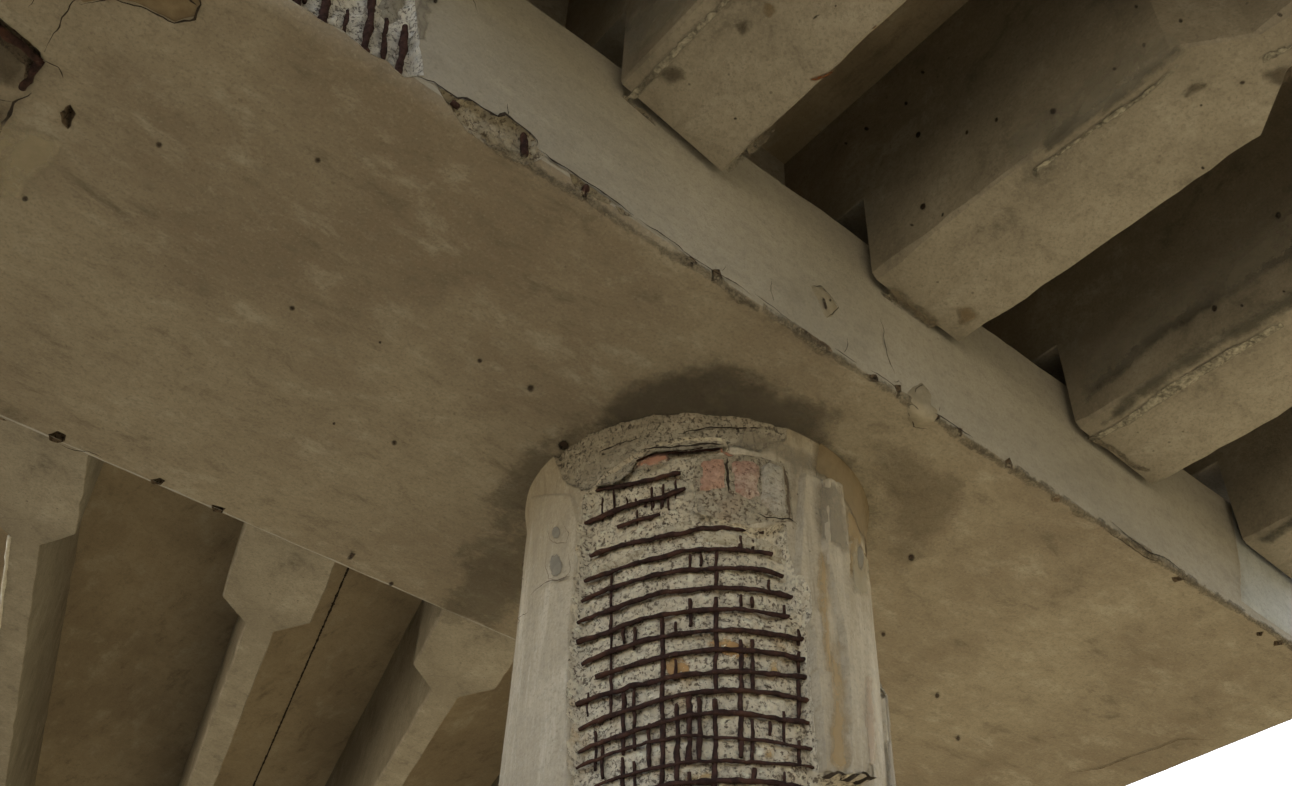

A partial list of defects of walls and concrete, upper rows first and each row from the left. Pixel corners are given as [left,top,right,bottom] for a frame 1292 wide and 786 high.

peeling [81,0,202,24]
spalling [0,18,45,91]
spalling [60,105,76,129]
spalling [292,0,919,410]
leakage [607,378,821,444]
rust [638,455,667,466]
spalling [935,415,1292,650]
leakage [0,535,11,628]
spalling [554,412,876,786]